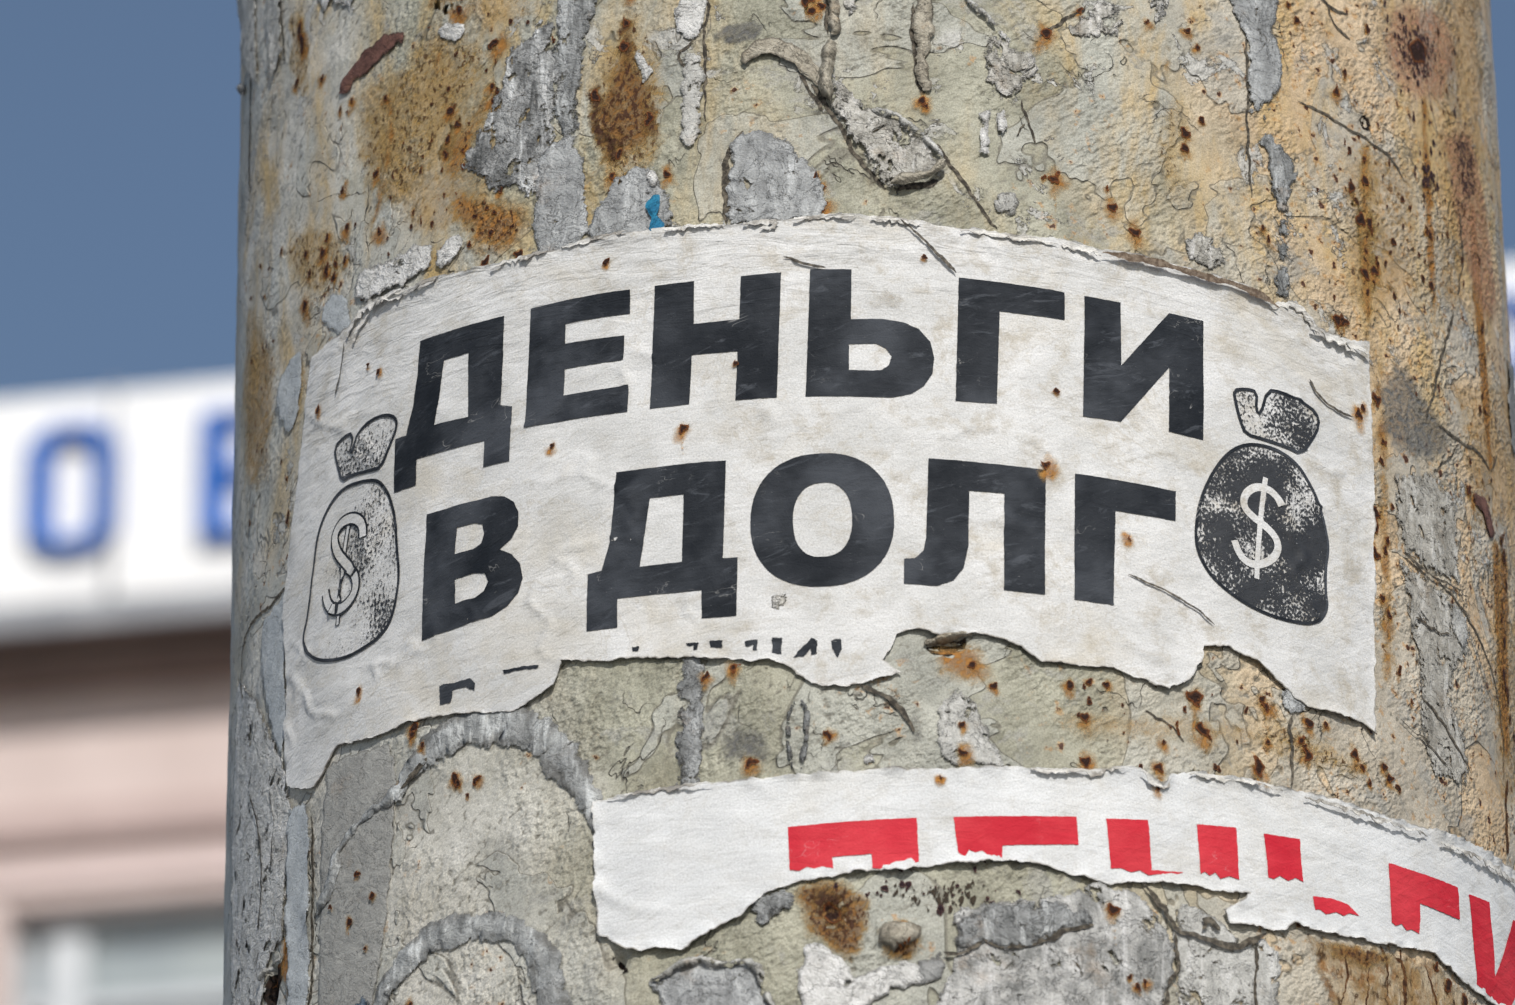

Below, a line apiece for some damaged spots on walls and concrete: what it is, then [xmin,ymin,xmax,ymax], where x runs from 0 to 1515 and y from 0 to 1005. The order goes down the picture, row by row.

corrosion [259,0,530,320]
peeling [461,0,677,251]
corrosion [585,0,673,191]
peeling [674,0,708,147]
peeling [723,130,827,225]
peeling [741,0,946,188]
corrosion [1331,0,1496,511]
peeling [1394,471,1470,785]
peeling [230,593,604,1005]
corrosion [1139,689,1222,796]
corrosion [1236,695,1401,793]
corrosion [797,860,997,959]